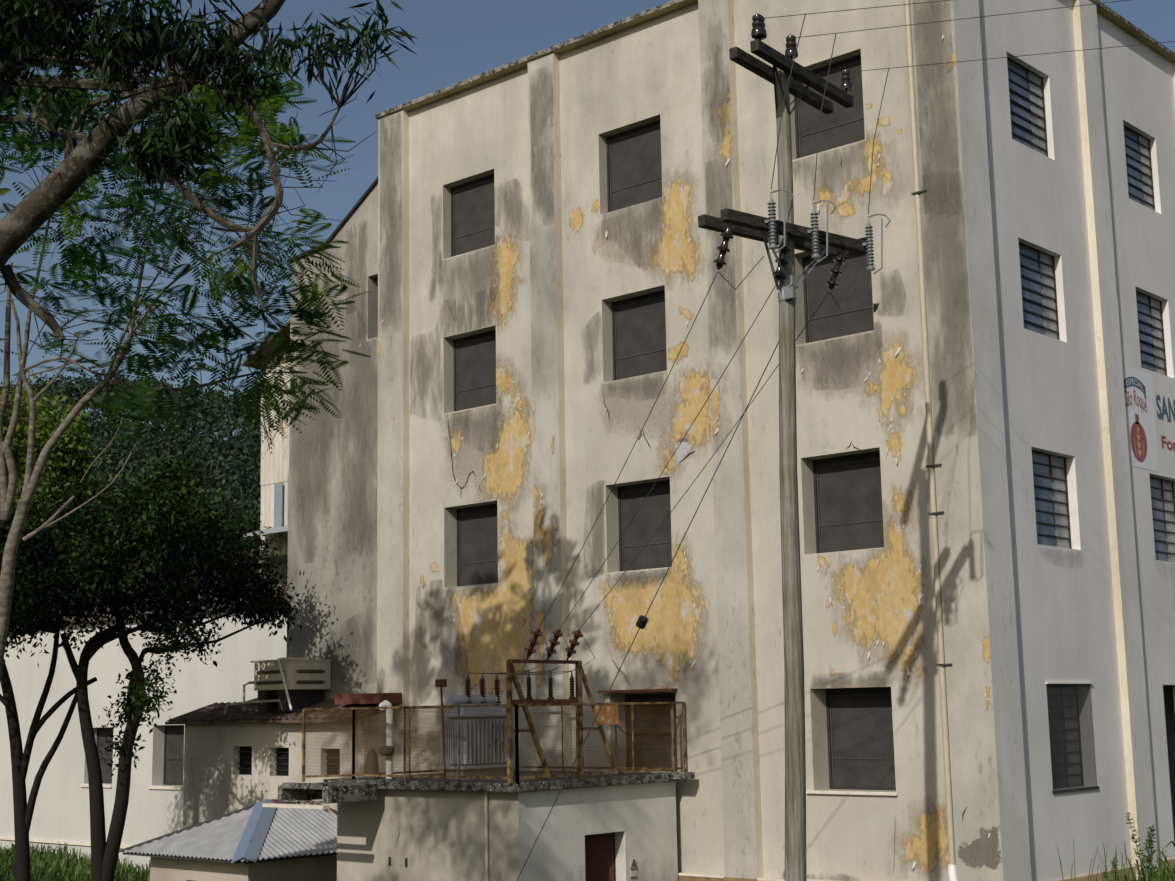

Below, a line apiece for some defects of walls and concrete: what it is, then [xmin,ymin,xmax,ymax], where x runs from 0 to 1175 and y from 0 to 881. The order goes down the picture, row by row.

leakage [530,77,549,214]
peeling [631,174,701,280]
leakage [707,166,728,218]
peeling [816,116,902,217]
leakage [920,0,969,419]
leakage [293,236,376,559]
peeling [606,341,722,474]
peeling [865,337,916,463]
peeling [449,360,557,695]
peeling [603,545,705,693]
peeling [817,488,924,677]
peeling [901,805,1001,874]